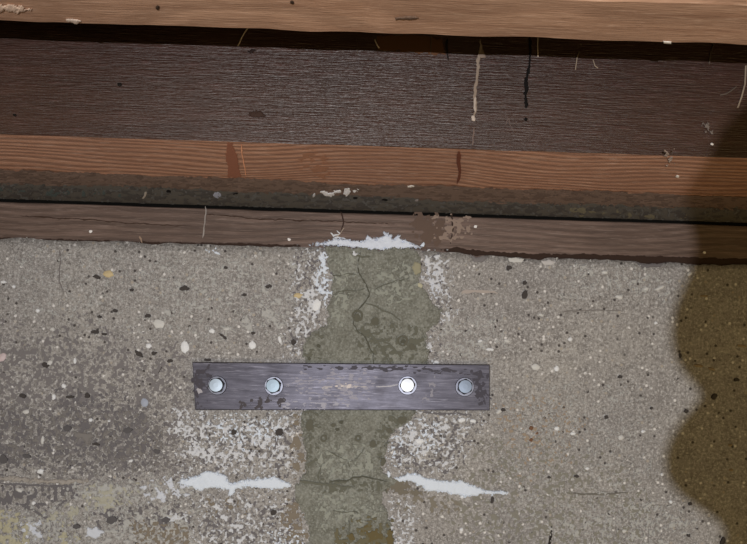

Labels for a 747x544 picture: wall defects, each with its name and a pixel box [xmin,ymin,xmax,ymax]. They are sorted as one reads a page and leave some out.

crack [333,252,409,364]
water stain [0,152,747,544]
crack [299,448,388,489]